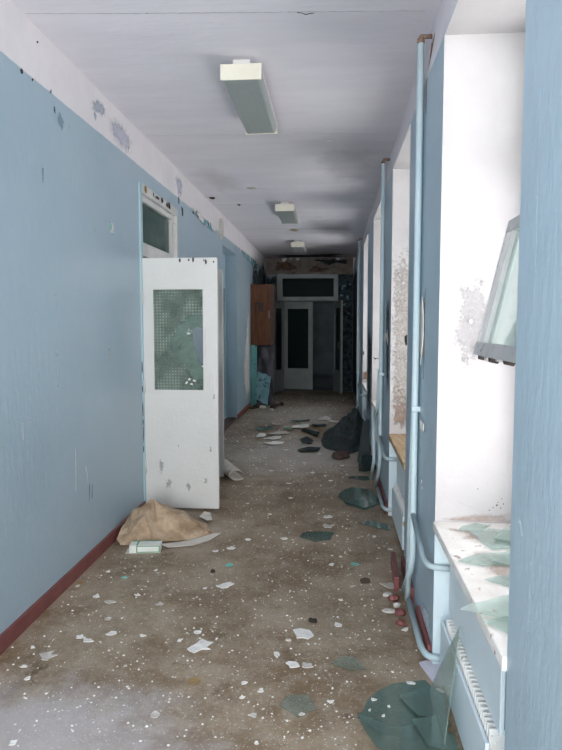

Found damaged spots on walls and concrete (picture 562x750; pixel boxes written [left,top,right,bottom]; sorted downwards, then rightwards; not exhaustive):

peeling [93,96,130,153]
peeling [383,255,409,413]